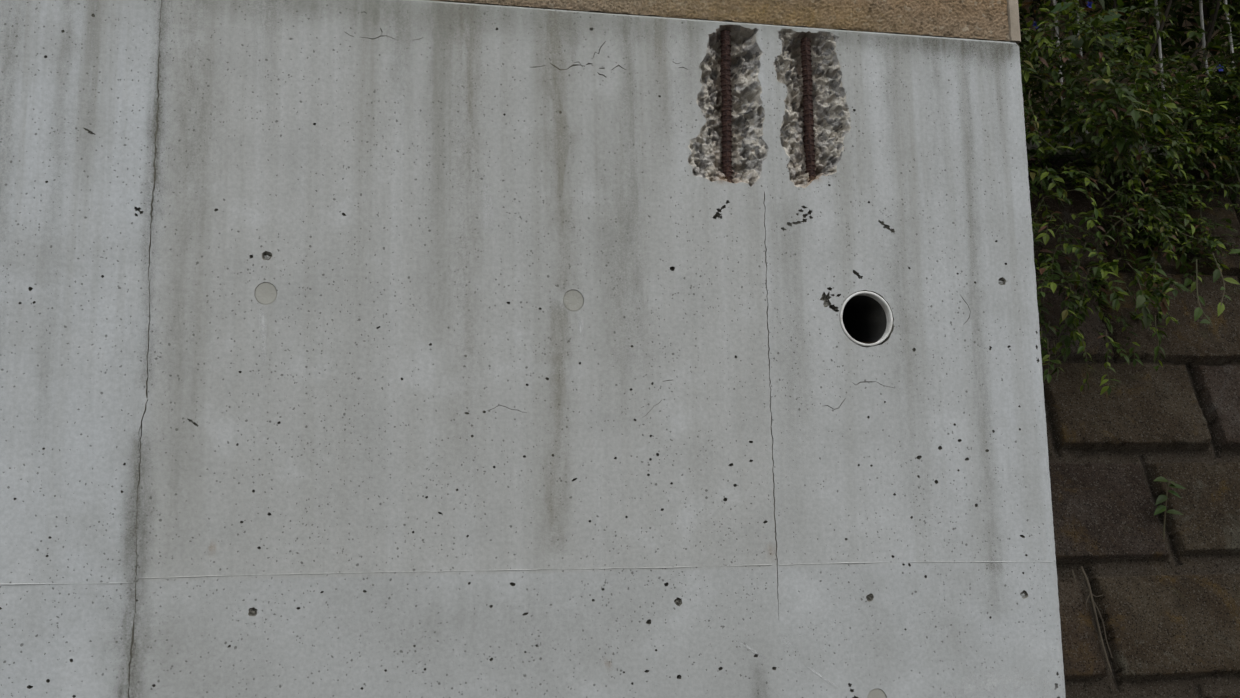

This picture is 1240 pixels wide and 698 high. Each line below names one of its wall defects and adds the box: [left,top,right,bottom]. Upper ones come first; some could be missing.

spalling [688,25,856,188]
spalling [781,206,813,231]
crack [127,0,162,698]